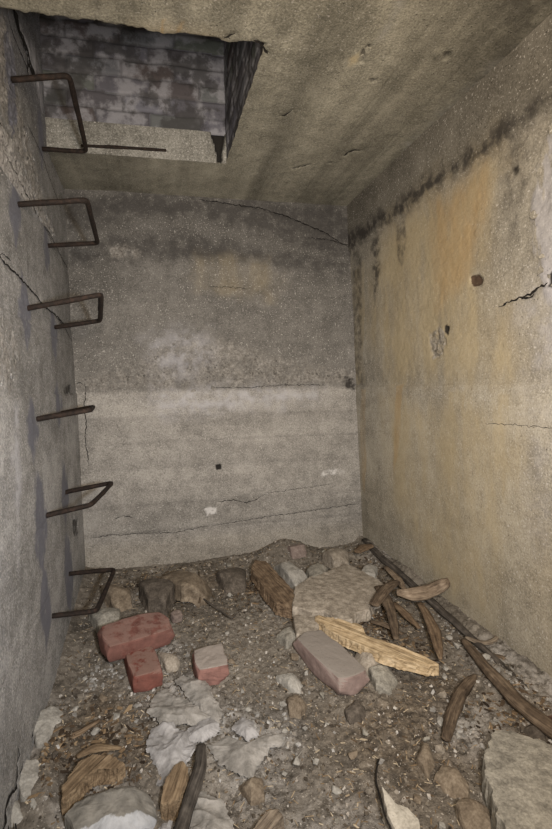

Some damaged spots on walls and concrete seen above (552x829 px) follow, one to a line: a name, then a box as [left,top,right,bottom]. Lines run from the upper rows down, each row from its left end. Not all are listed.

crack [7,9,35,75]
crack [198,199,348,247]
leakage [64,71,552,389]
crack [0,253,72,341]
crack [499,283,547,307]
leakage [125,310,336,431]
leakage [495,231,552,582]